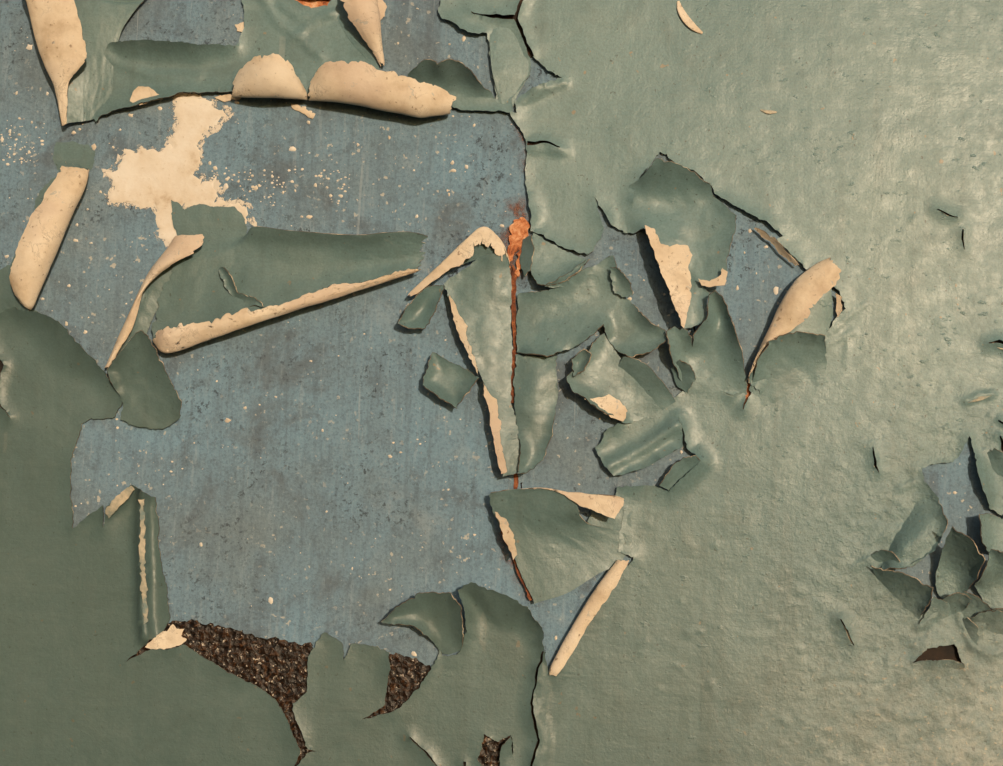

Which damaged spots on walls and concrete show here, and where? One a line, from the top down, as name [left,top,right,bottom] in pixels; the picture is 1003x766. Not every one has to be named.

peeling [677,1,703,34]
crack [527,140,560,148]
peeling [0,0,531,766]
rust [505,204,531,403]
peeling [398,152,845,680]
peeling [870,437,1003,645]
crack [530,651,546,766]